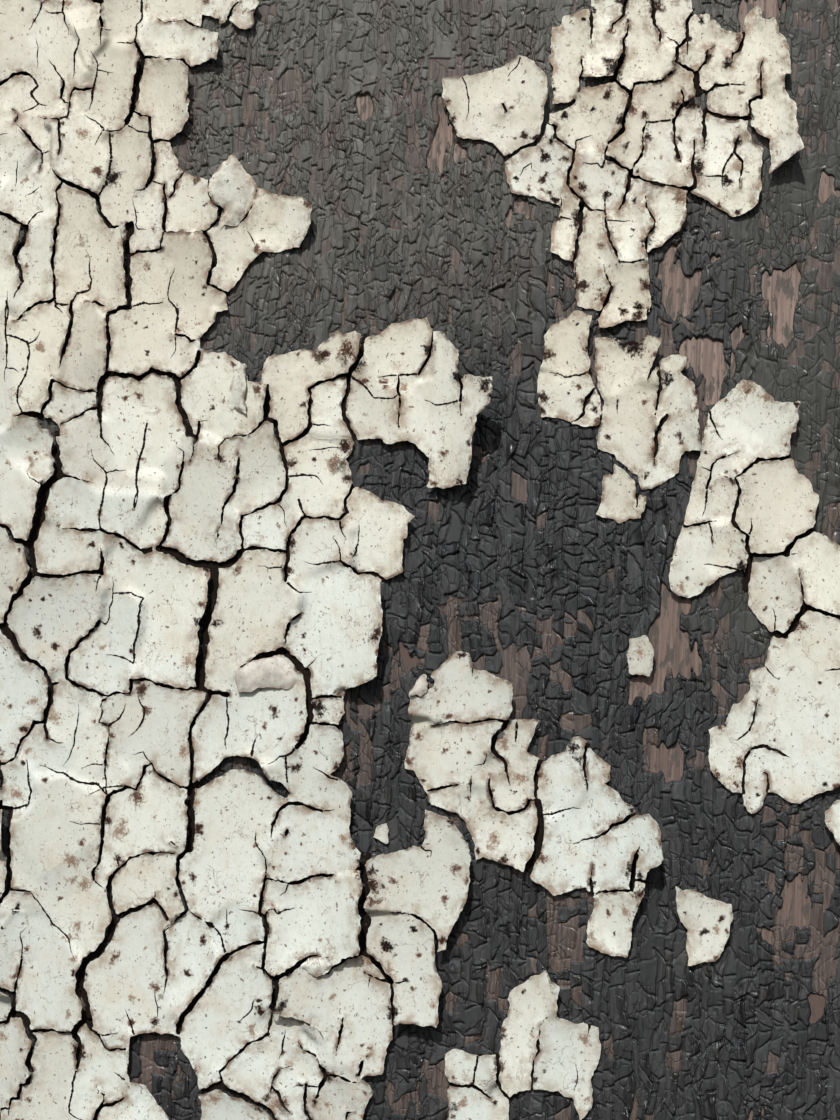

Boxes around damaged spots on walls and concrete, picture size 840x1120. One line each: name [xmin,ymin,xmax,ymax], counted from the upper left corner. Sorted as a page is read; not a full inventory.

crack [548,0,763,312]
peeling [427,0,840,845]
crack [0,0,463,1120]
peeling [0,0,664,1120]
crack [684,411,840,639]
crack [427,718,590,872]
crack [573,813,648,895]
peeling [675,886,733,966]
crack [737,700,789,793]
peeling [762,873,811,945]
peeling [808,994,825,1024]